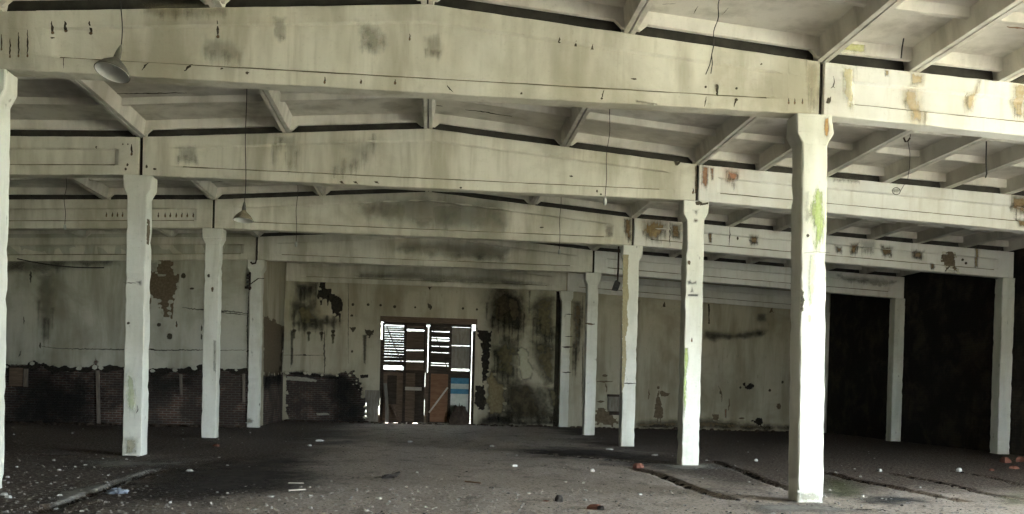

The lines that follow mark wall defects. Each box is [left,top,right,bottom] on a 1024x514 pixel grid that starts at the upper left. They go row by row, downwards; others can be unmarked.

corrosion [702,166,713,187]
corrosion [644,221,666,239]
flaking render [4,359,124,425]
peeling [149,260,194,339]
flaking render [148,364,203,426]
flaking render [219,303,374,427]
damp [491,289,557,422]
damp [705,315,764,338]